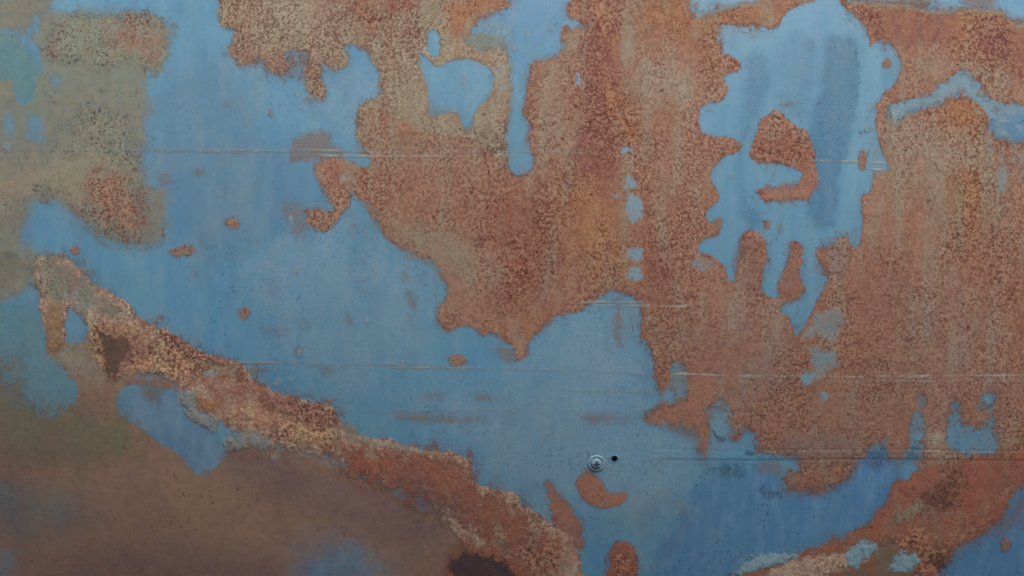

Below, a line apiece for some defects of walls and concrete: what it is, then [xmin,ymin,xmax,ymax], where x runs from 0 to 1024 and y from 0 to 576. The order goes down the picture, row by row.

rust [38,7,179,78]
rust [0,96,629,576]
rust [215,0,1024,576]